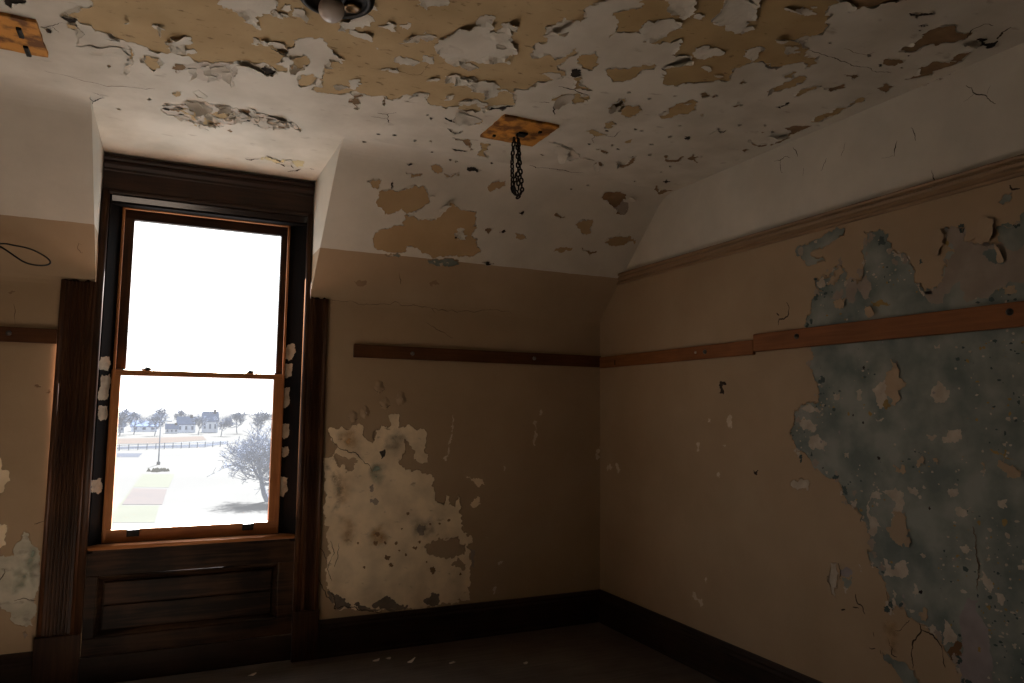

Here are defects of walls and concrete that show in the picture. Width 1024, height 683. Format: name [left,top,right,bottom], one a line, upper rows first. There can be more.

peeling [58,0,1000,268]
peeling [795,210,1024,328]
peeling [98,356,111,421]
peeling [283,343,296,408]
flaking render [0,457,11,494]
peeling [91,478,103,494]
peeling [280,477,288,497]
flaking render [319,413,484,613]
peeling [789,327,1024,683]
flaking render [0,523,41,628]